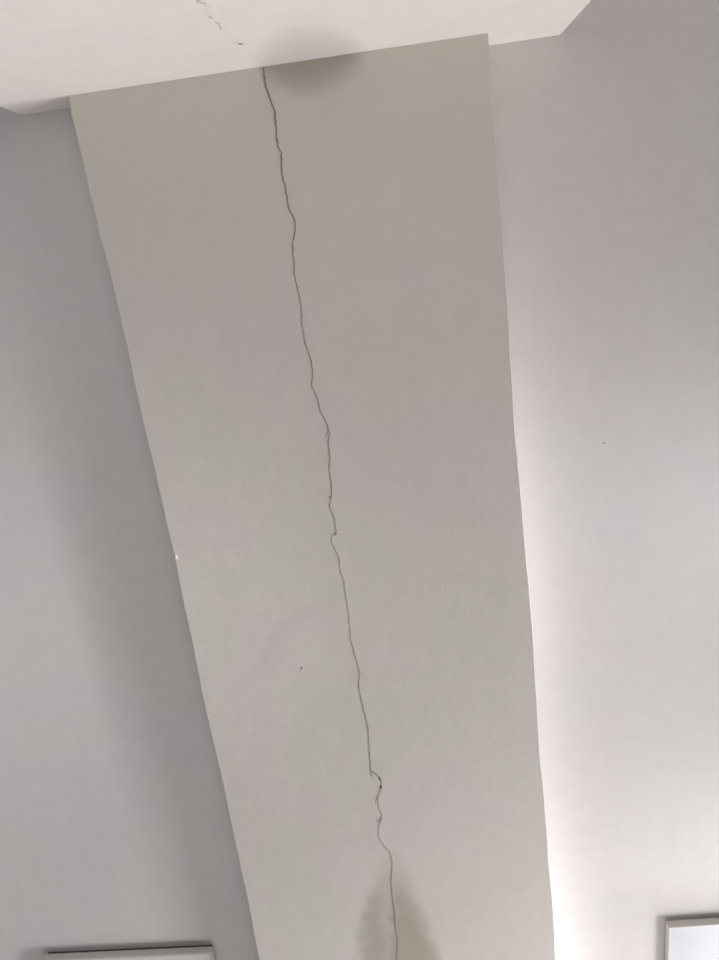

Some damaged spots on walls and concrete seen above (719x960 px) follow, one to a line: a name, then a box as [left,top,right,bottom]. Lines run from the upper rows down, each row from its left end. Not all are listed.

crack [196,0,398,959]